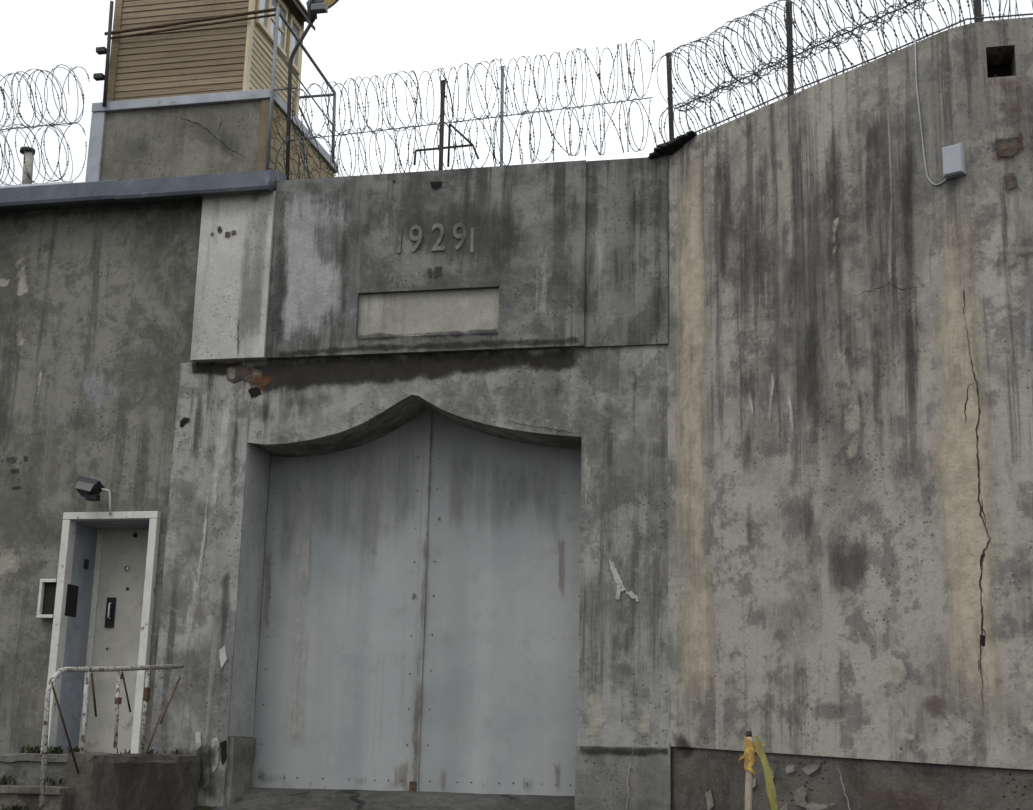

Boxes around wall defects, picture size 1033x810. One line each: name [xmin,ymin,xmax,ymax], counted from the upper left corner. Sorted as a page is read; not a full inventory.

crack [179,117,246,158]
spalling [994,136,1022,157]
spalling [1004,173,1018,190]
damp [840,354,860,430]
damp [937,219,996,699]
crack [963,285,991,718]
spalling [752,760,820,788]
spalling [781,787,835,810]